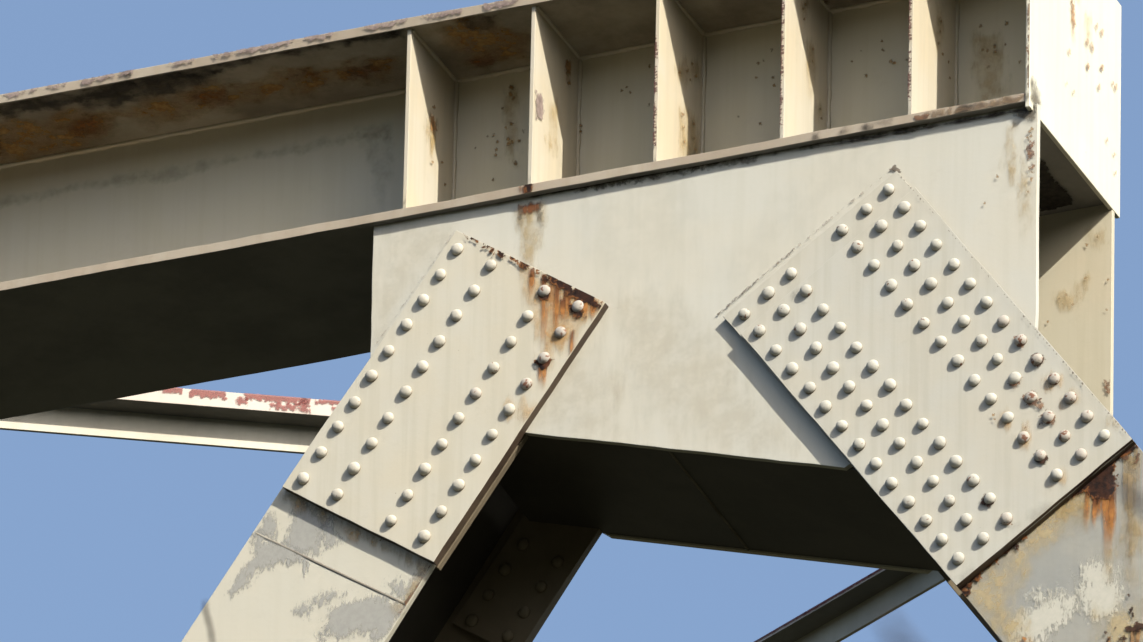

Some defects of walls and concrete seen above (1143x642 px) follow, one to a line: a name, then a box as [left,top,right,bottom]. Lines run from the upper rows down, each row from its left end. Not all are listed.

corrosion [1018,0,1040,104]
corrosion [463,233,603,352]
corrosion [534,358,555,380]
corrosion [1009,377,1056,426]
corrosion [1060,444,1140,532]
peeling [230,501,343,598]
peeling [293,570,425,642]
corrosion [960,535,1027,596]
peeling [1004,553,1125,642]
corrosion [1104,594,1143,642]